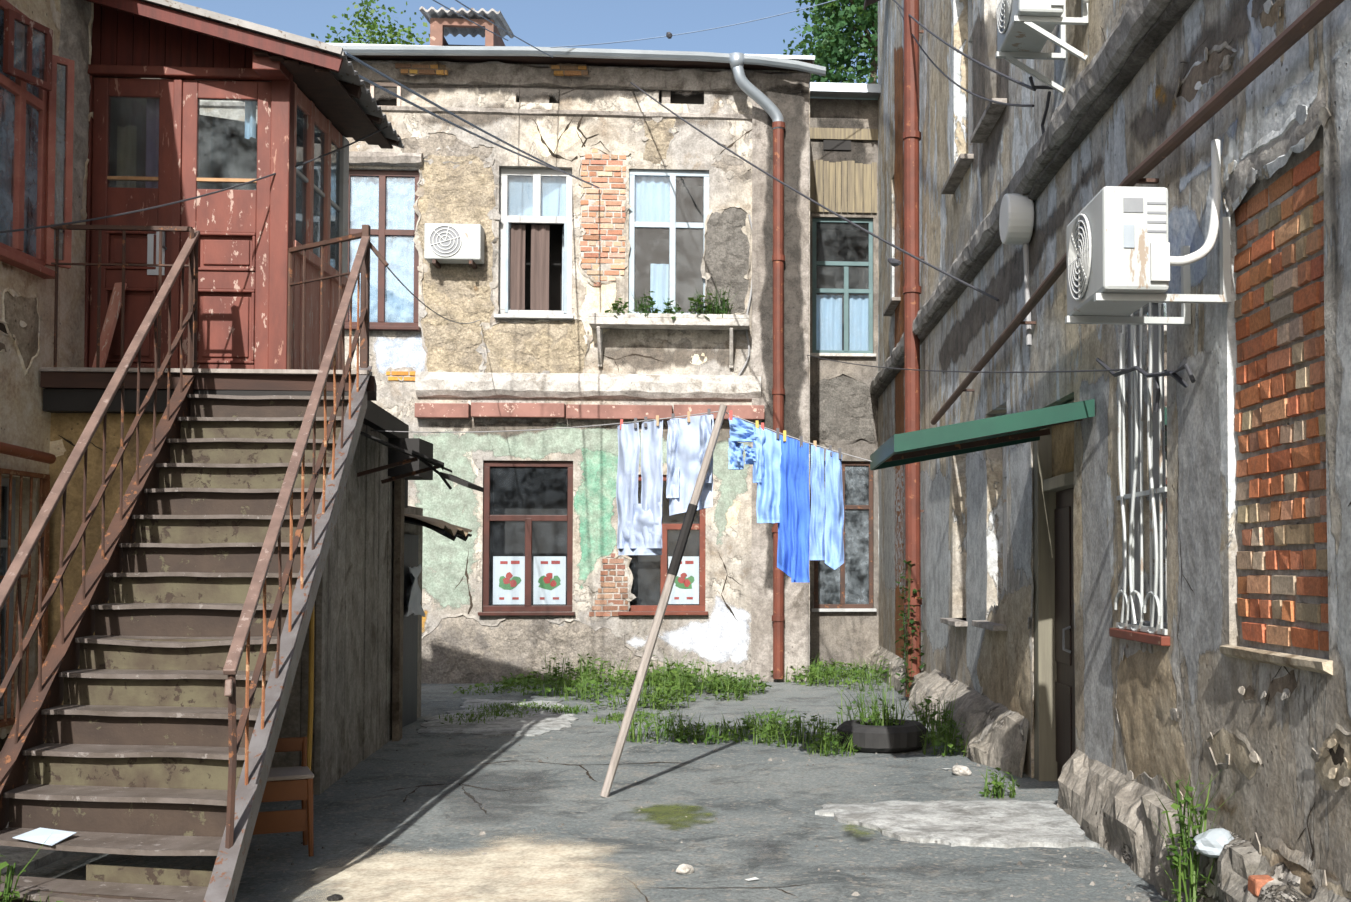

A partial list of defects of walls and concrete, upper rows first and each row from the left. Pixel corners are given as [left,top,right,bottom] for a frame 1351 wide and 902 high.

crack [534,116,609,162]
flaking render [574,117,679,287]
spalling [1174,41,1238,108]
spalling [1222,83,1331,217]
spalling [413,423,692,684]
peeling [713,440,751,545]
peeling [1310,111,1351,796]
spalling [1238,668,1298,704]